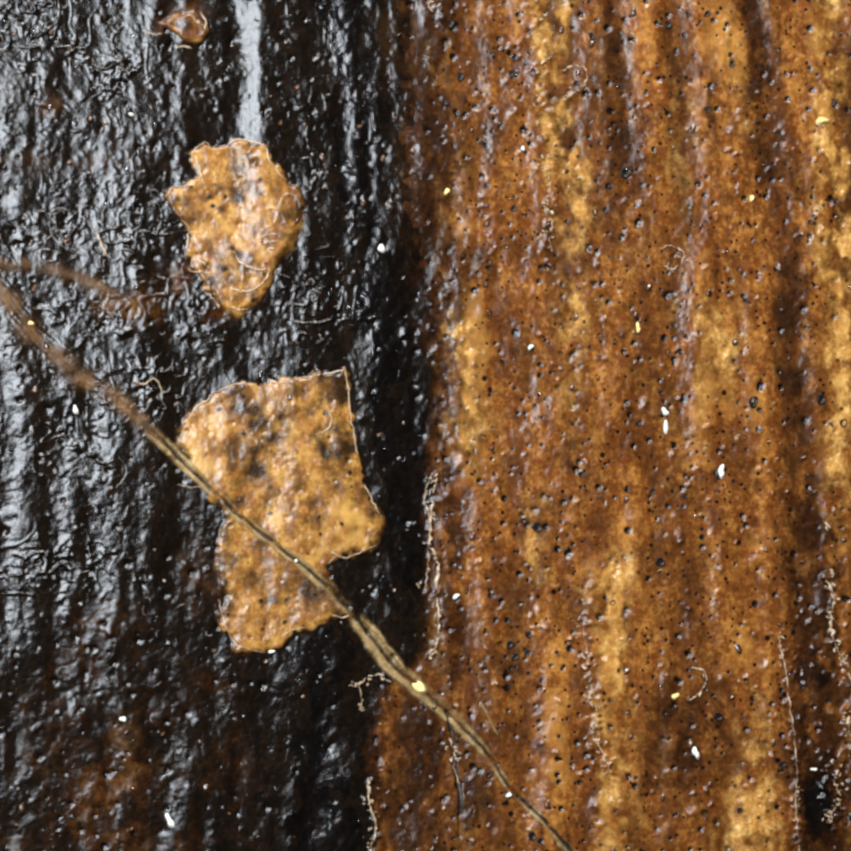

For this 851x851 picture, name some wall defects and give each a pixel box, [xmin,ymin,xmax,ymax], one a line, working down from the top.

peeling [164,138,304,317]
corrosion [541,99,592,254]
corrosion [812,55,851,199]
crack [0,262,214,494]
corrosion [444,318,484,450]
corrosion [695,298,738,398]
corrosion [815,216,851,498]
crack [232,512,325,587]
peeling [177,367,385,653]
corrosion [597,550,639,700]
crack [336,599,574,851]
corrosion [725,773,781,851]